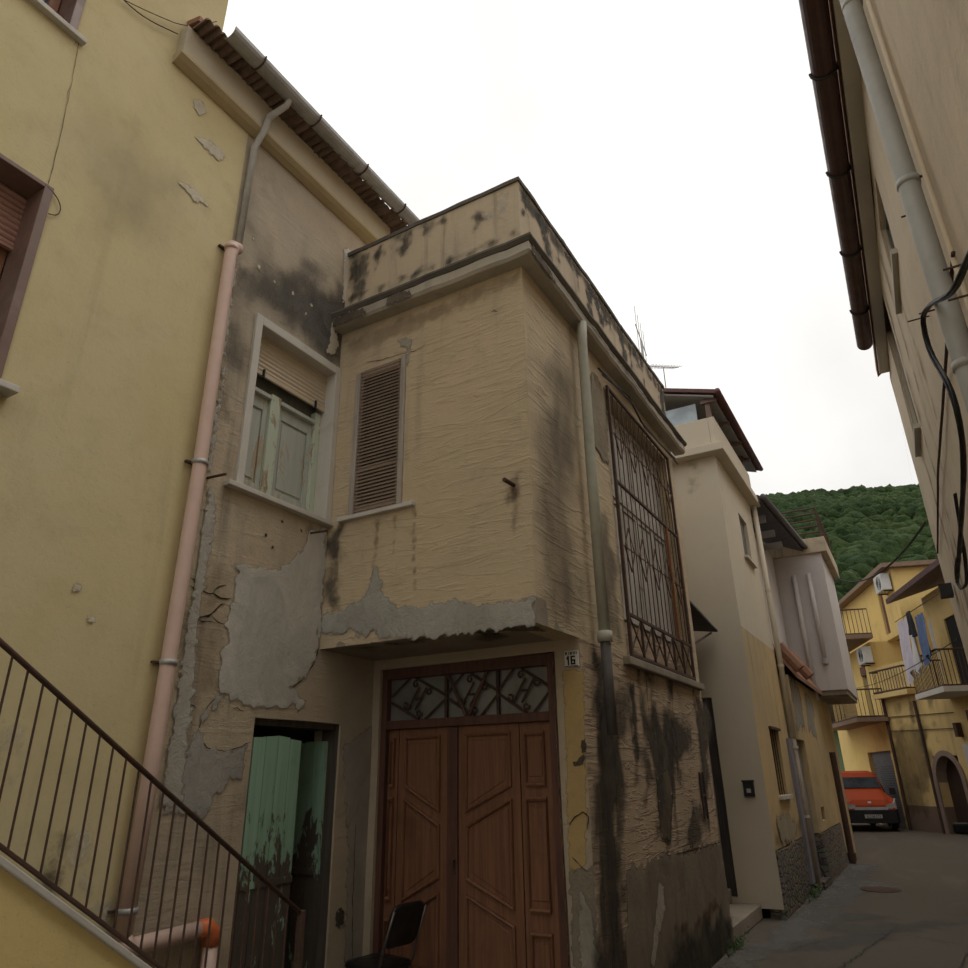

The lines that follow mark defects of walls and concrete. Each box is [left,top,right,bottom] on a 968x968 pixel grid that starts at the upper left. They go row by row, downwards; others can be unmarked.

flaking render [477,625,544,633]
flaking render [573,740,587,767]
leakage [593,652,712,968]
flaking render [578,891,596,968]
leakage [670,910,733,968]